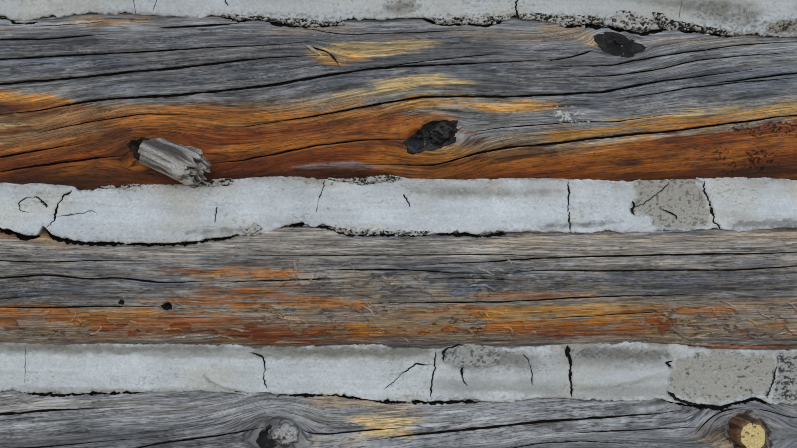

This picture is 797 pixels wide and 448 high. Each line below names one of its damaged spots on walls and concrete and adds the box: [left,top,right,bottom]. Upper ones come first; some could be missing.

crack [0,27,797,172]
crack [18,192,98,228]
spalling [630,177,712,231]
crack [703,180,722,230]
crack [0,251,797,283]
crack [360,293,709,319]
crack [386,344,464,400]
crack [565,346,573,396]
spalling [667,349,797,405]
crack [0,406,127,416]
crack [22,426,267,448]
crack [299,391,737,448]